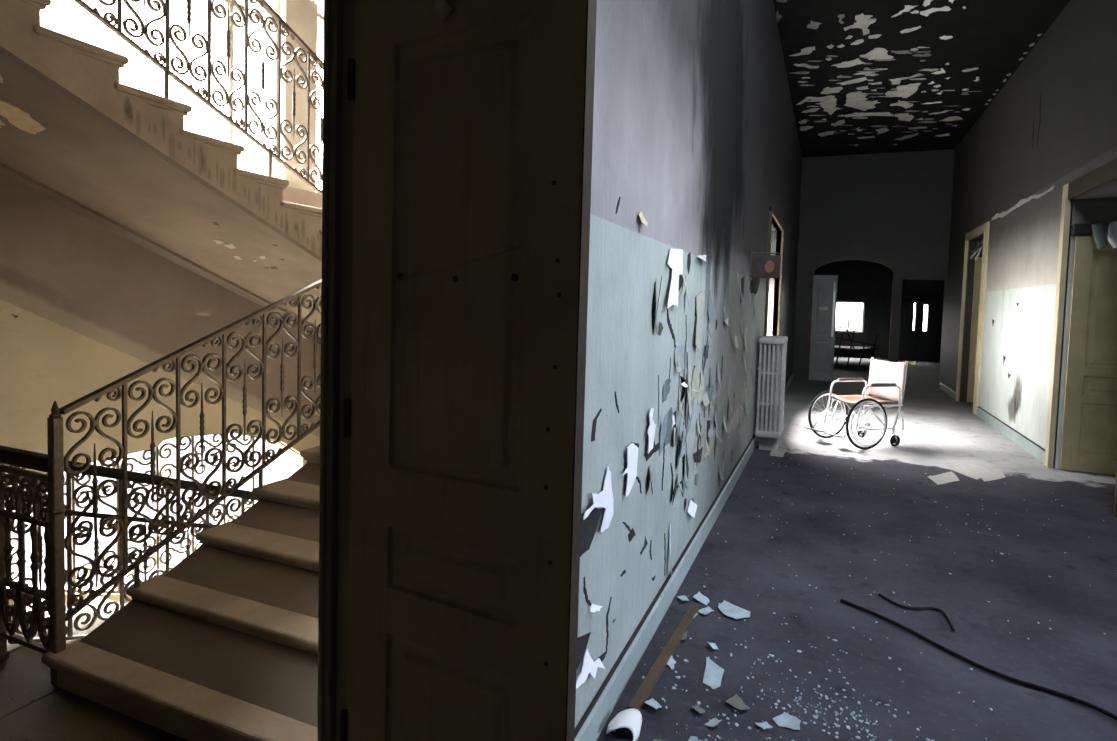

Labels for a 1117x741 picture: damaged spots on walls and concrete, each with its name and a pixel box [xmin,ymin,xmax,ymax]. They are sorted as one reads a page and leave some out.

peeling [892,0,966,33]
peeling [0,100,46,134]
peeling [790,13,1011,147]
peeling [580,248,760,557]
peeling [640,525,672,581]
peeling [576,577,616,689]